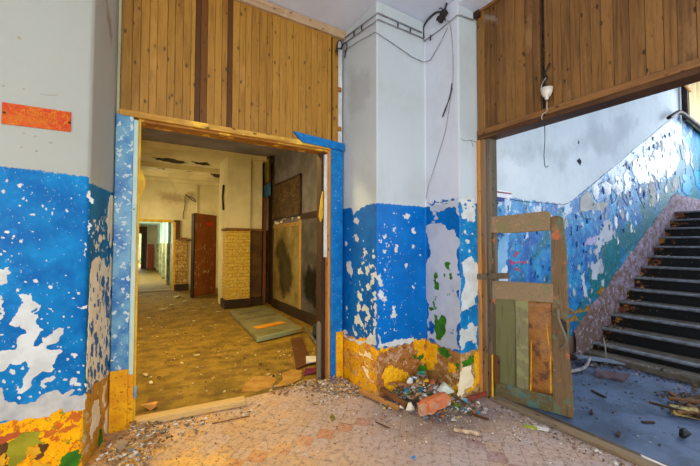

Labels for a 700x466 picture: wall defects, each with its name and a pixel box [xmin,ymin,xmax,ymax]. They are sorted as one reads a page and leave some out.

peeling [0,195,114,466]
spalling [152,157,220,178]
peeling [343,192,479,397]
peeling [498,231,551,283]
peeling [562,130,700,324]